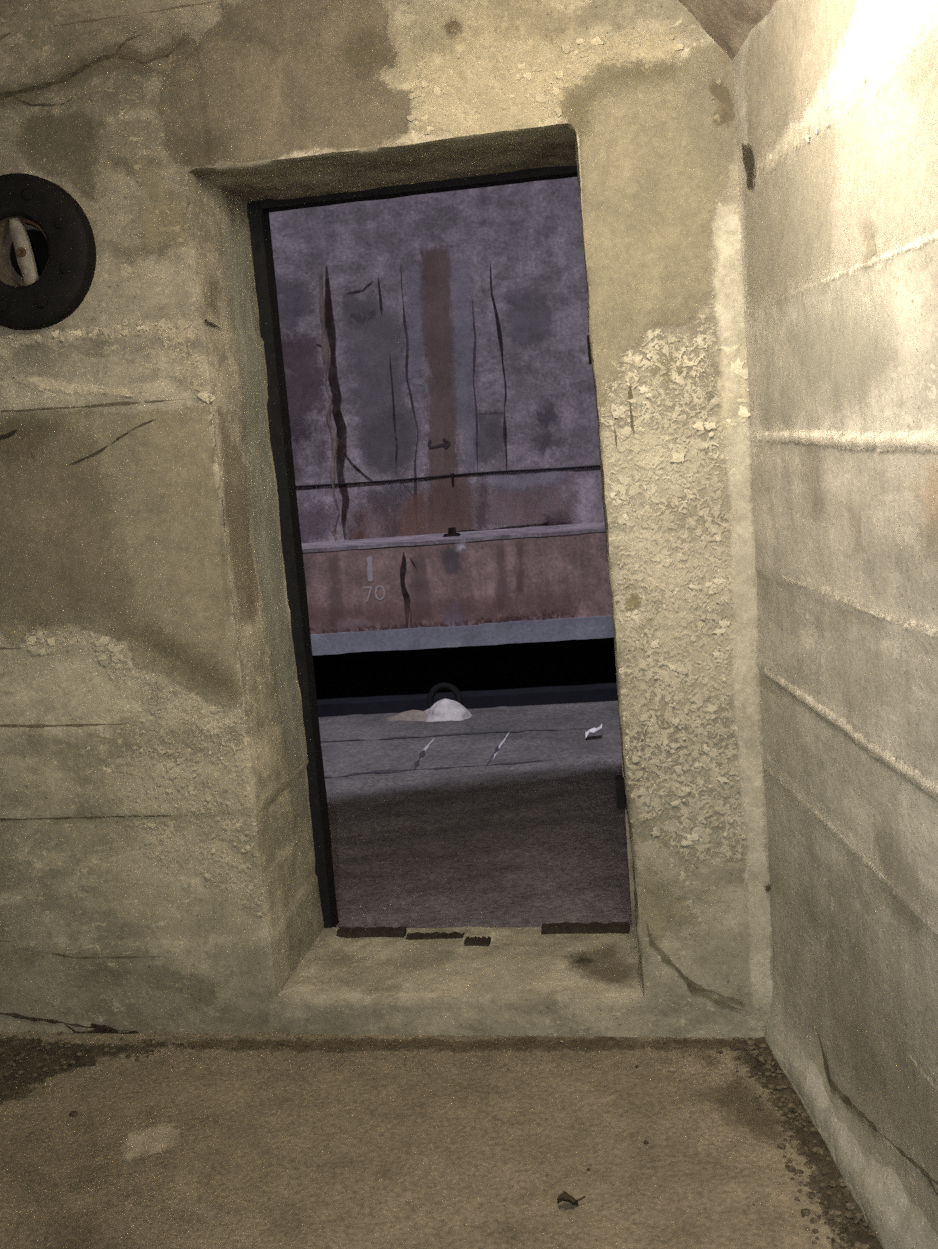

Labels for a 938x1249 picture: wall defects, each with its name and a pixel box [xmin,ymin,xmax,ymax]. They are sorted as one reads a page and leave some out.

crack [0,35,181,106]
leakage [61,0,413,166]
leakage [0,231,308,815]
crack [315,263,421,627]
corrosion [310,609,574,634]
crack [0,1013,139,1034]
crack [646,924,748,1013]
crack [816,1029,938,1196]